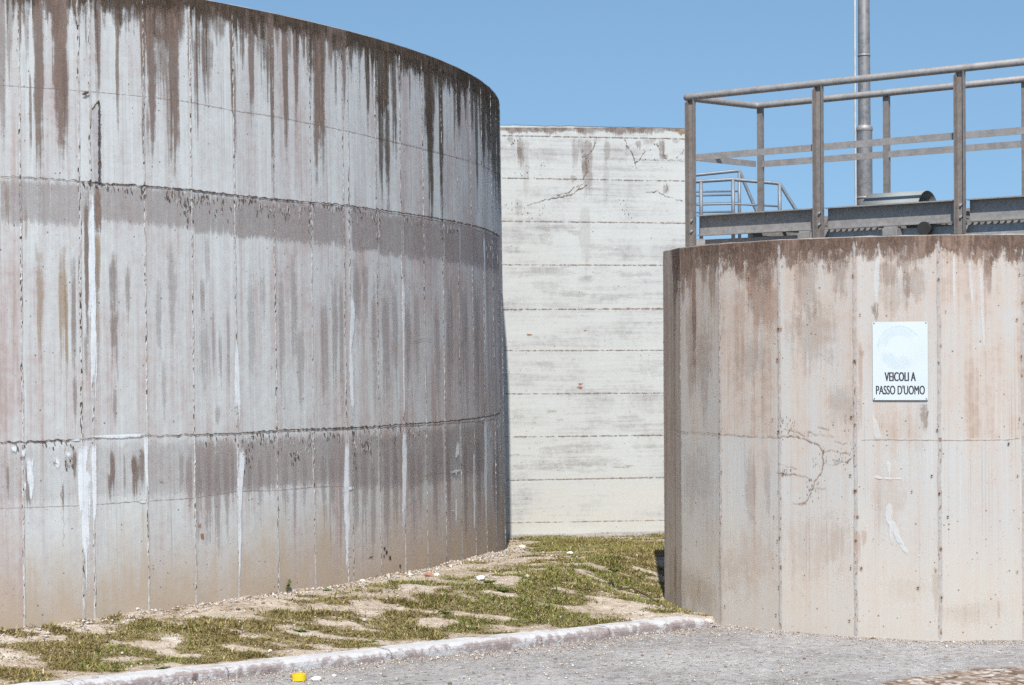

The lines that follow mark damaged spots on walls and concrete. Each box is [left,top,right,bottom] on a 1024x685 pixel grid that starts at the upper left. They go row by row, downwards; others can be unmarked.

water stain [18,0,77,166]
water stain [96,0,124,98]
water stain [139,0,184,169]
crack [1,85,685,236]
water stain [194,5,584,358]
water stain [59,272,68,360]
water stain [84,188,101,398]
crack [0,437,99,465]
water stain [54,434,149,587]
water stain [195,435,313,576]
water stain [344,445,352,568]
crack [129,392,1020,505]